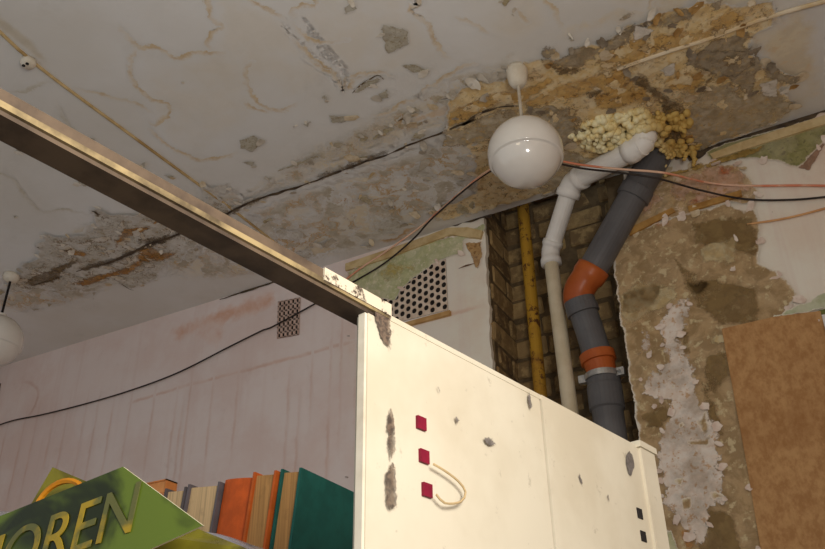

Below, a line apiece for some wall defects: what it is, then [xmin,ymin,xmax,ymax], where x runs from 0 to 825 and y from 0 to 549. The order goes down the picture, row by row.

damp [72,0,452,163]
damp [453,0,824,136]
damp [223,57,513,263]
crack [226,104,517,215]
crack [31,233,181,286]
peeling [0,206,256,313]
crack [453,214,492,226]
spalling [196,0,825,549]
damp [127,320,355,405]